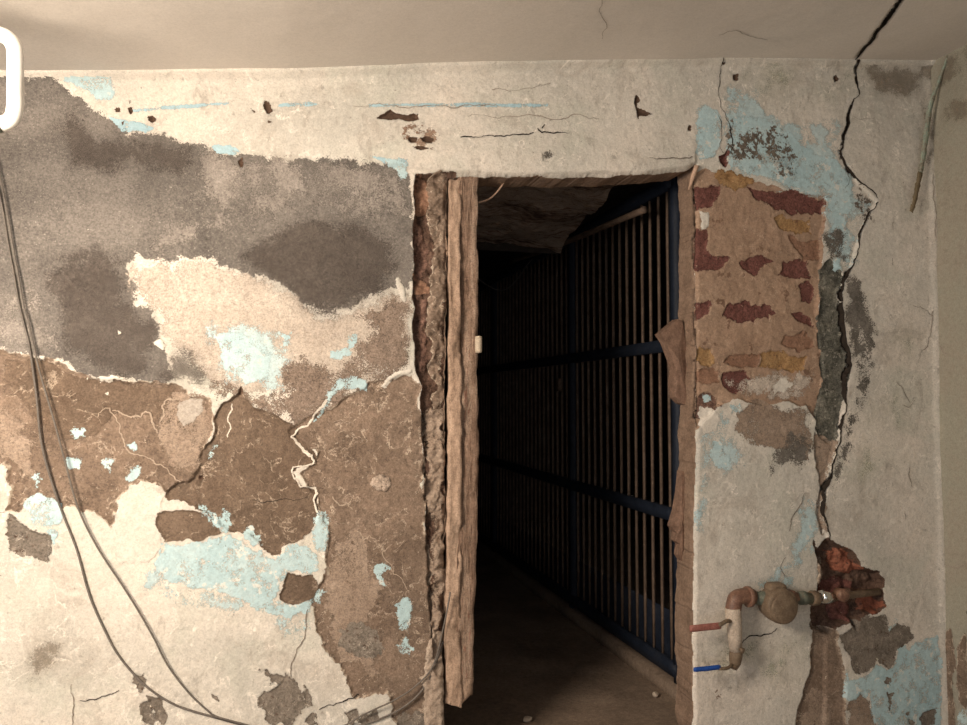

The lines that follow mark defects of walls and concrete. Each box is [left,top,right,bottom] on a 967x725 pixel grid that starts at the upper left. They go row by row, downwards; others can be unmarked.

water stain [0,76,414,396]
spalling [377,109,419,121]
spalling [408,136,434,150]
crack [356,83,599,138]
flaking render [693,148,828,435]
crack [789,0,902,541]
spalling [0,158,456,725]
spalling [796,433,914,725]
spalling [905,628,967,725]